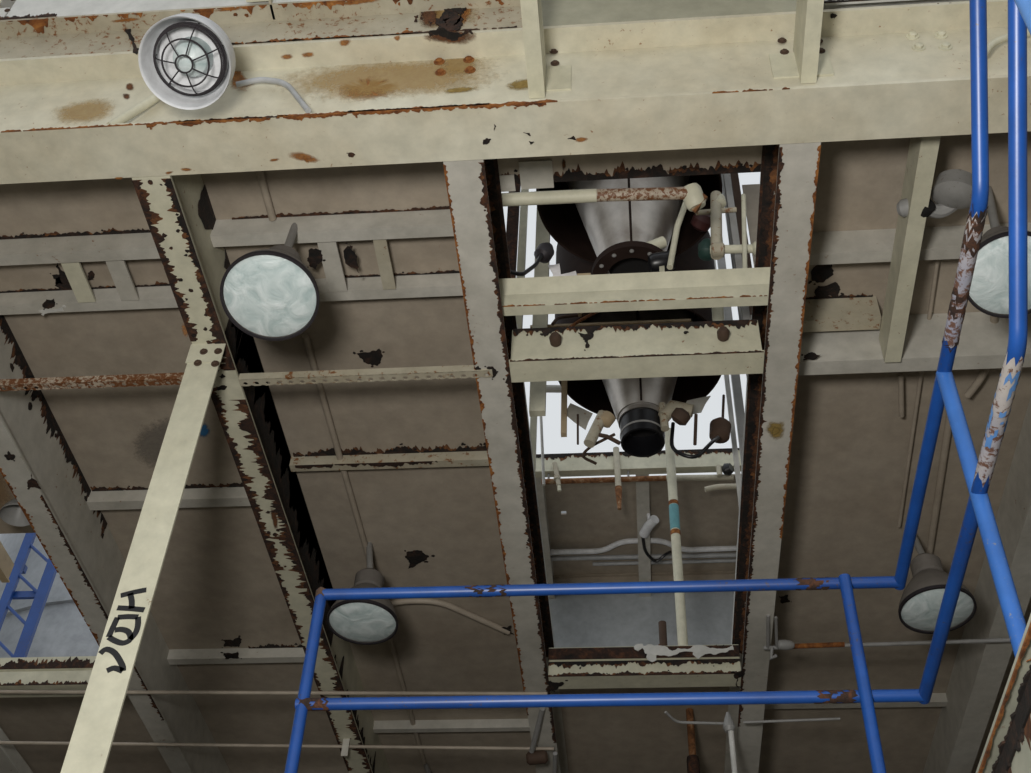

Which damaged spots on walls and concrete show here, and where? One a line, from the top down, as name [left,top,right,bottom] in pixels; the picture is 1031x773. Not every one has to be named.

rust [0,12,143,55]
rust [180,0,376,18]
rust [232,0,517,46]
rust [1,58,558,133]
rust [0,144,873,773]
peeling [634,644,734,662]